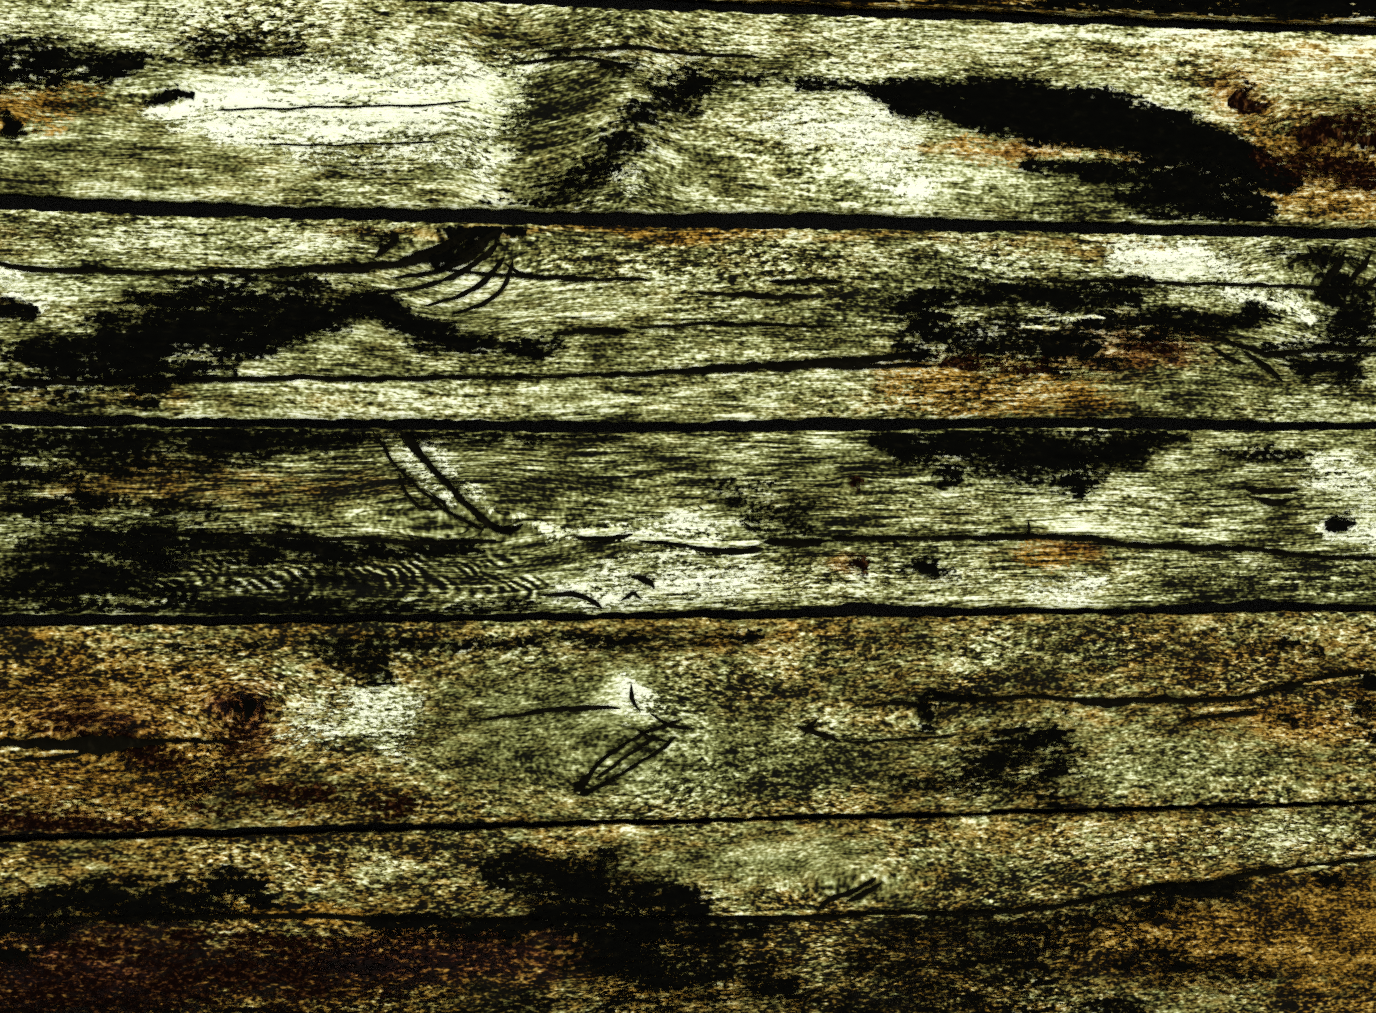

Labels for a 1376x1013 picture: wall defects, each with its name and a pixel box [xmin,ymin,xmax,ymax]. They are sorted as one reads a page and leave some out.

damp [851,0,1376,20]
damp [470,42,1376,222]
damp [884,240,1376,393]
damp [0,224,625,615]
damp [864,428,1192,503]
damp [167,640,260,655]
damp [305,626,765,691]
crack [796,670,1366,744]
crack [0,856,1376,948]